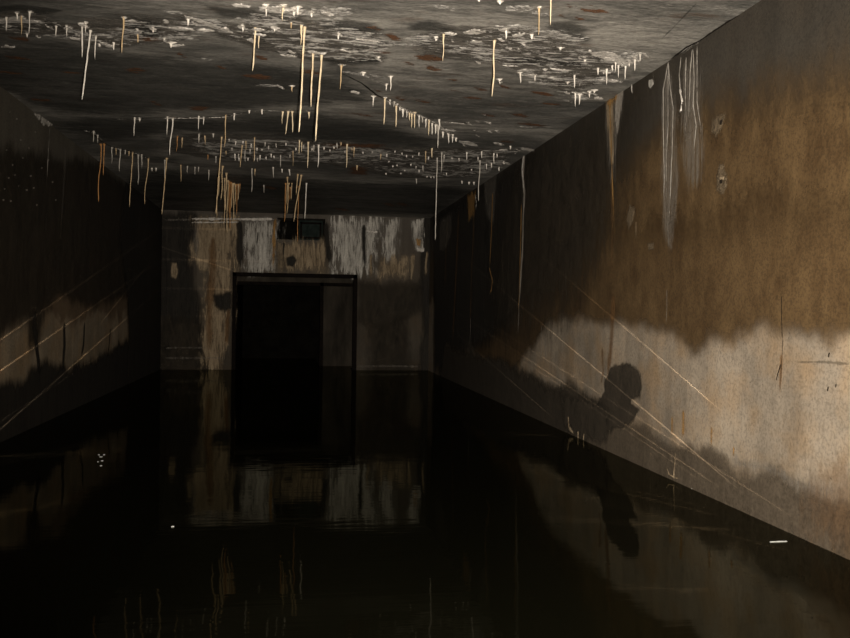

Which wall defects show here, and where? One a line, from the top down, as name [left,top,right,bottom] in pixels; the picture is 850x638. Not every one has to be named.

damp [232,3,352,17]
damp [505,5,552,16]
damp [2,16,126,48]
damp [125,11,322,47]
damp [277,50,329,58]
damp [338,31,418,62]
damp [433,24,541,53]
damp [65,116,429,143]
damp [134,173,468,263]
damp [440,50,850,560]